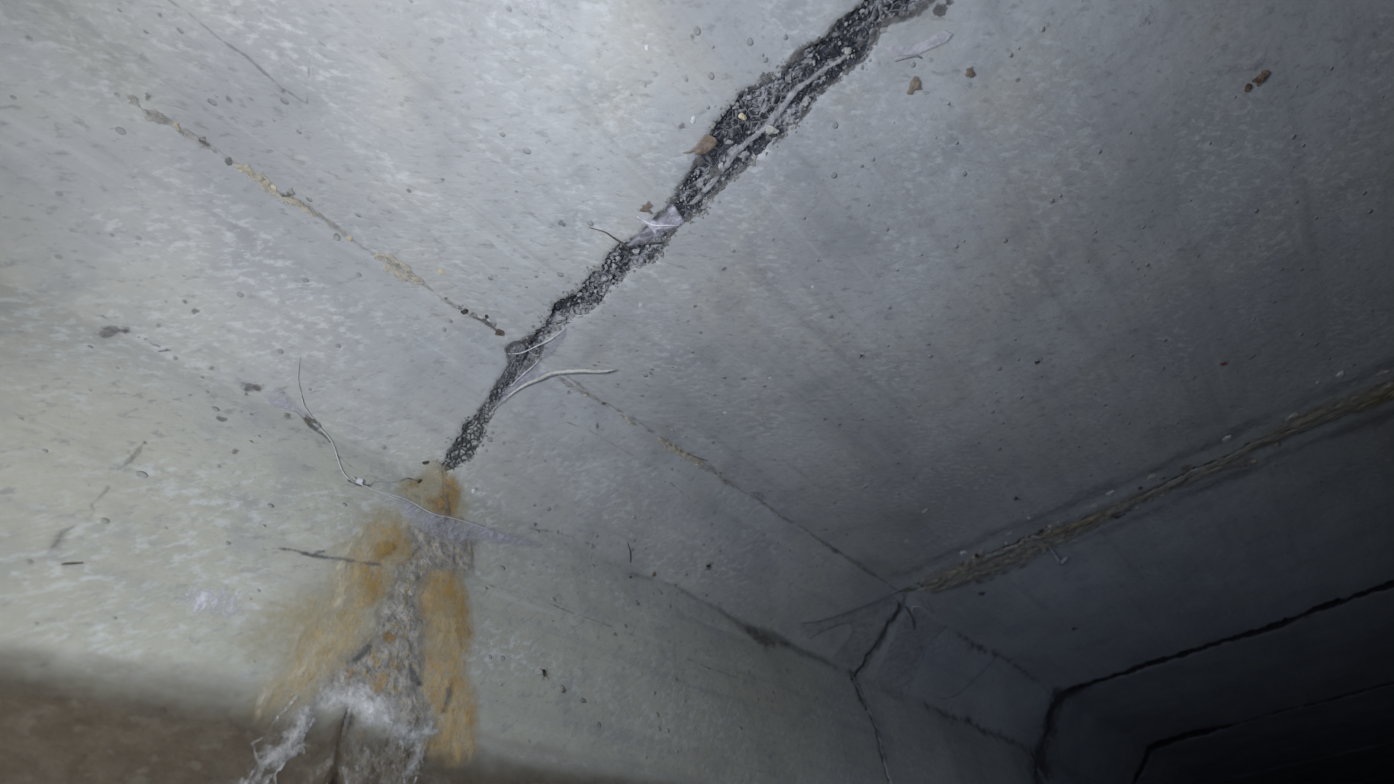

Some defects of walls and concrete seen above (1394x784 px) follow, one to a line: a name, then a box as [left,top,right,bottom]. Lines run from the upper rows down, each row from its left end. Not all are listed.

crack [282,0,952,590]
crack [1130,437,1272,500]
leakage [0,524,599,784]
crack [848,513,1098,784]